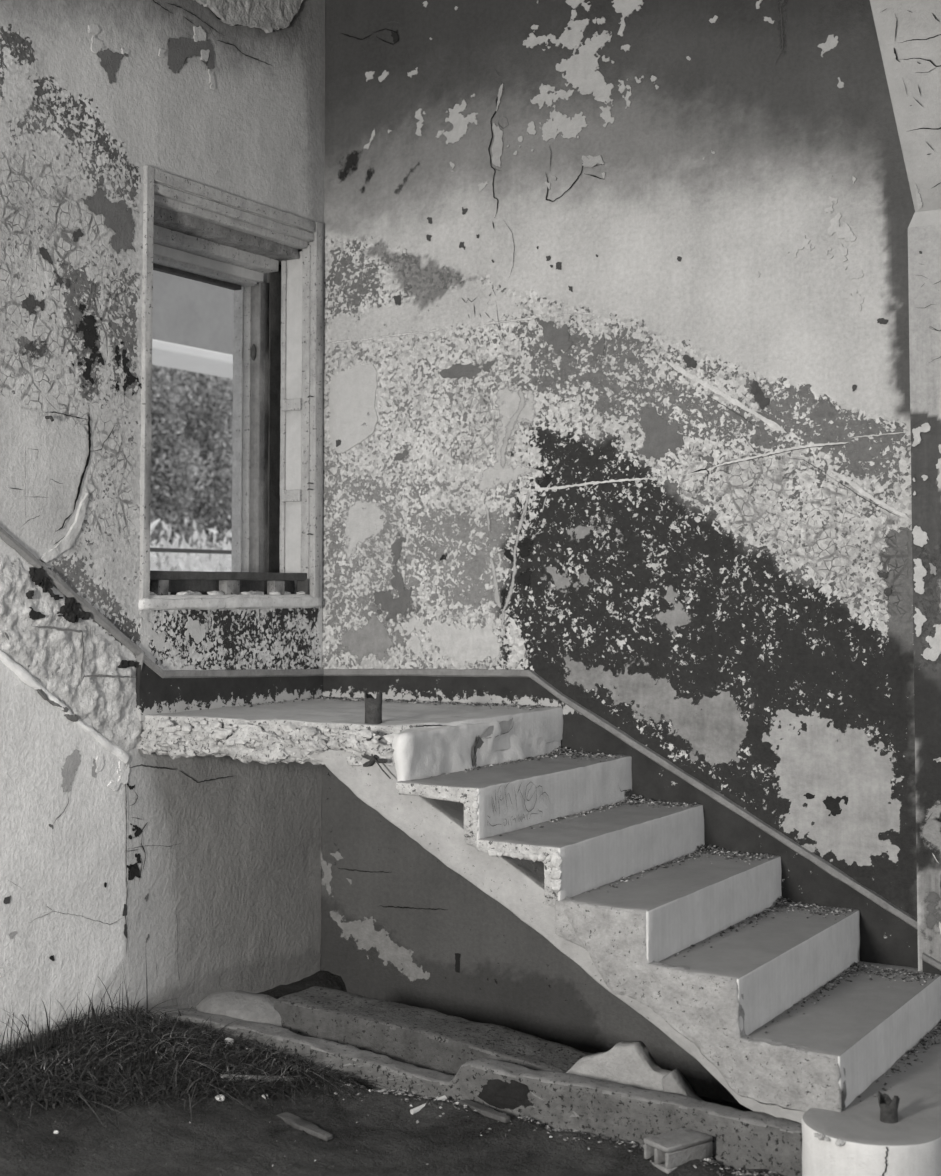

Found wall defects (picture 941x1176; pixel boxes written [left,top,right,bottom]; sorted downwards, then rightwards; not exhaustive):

peeling [81,166,136,254]
crack [153,0,272,66]
peeling [415,94,478,144]
crack [488,69,514,277]
peeling [507,0,659,202]
crack [883,9,941,155]
peeling [72,303,142,397]
crack [11,397,116,545]
peeling [637,408,686,462]
peeling [912,526,941,661]
flaking render [0,553,394,829]
crack [814,1133,845,1146]